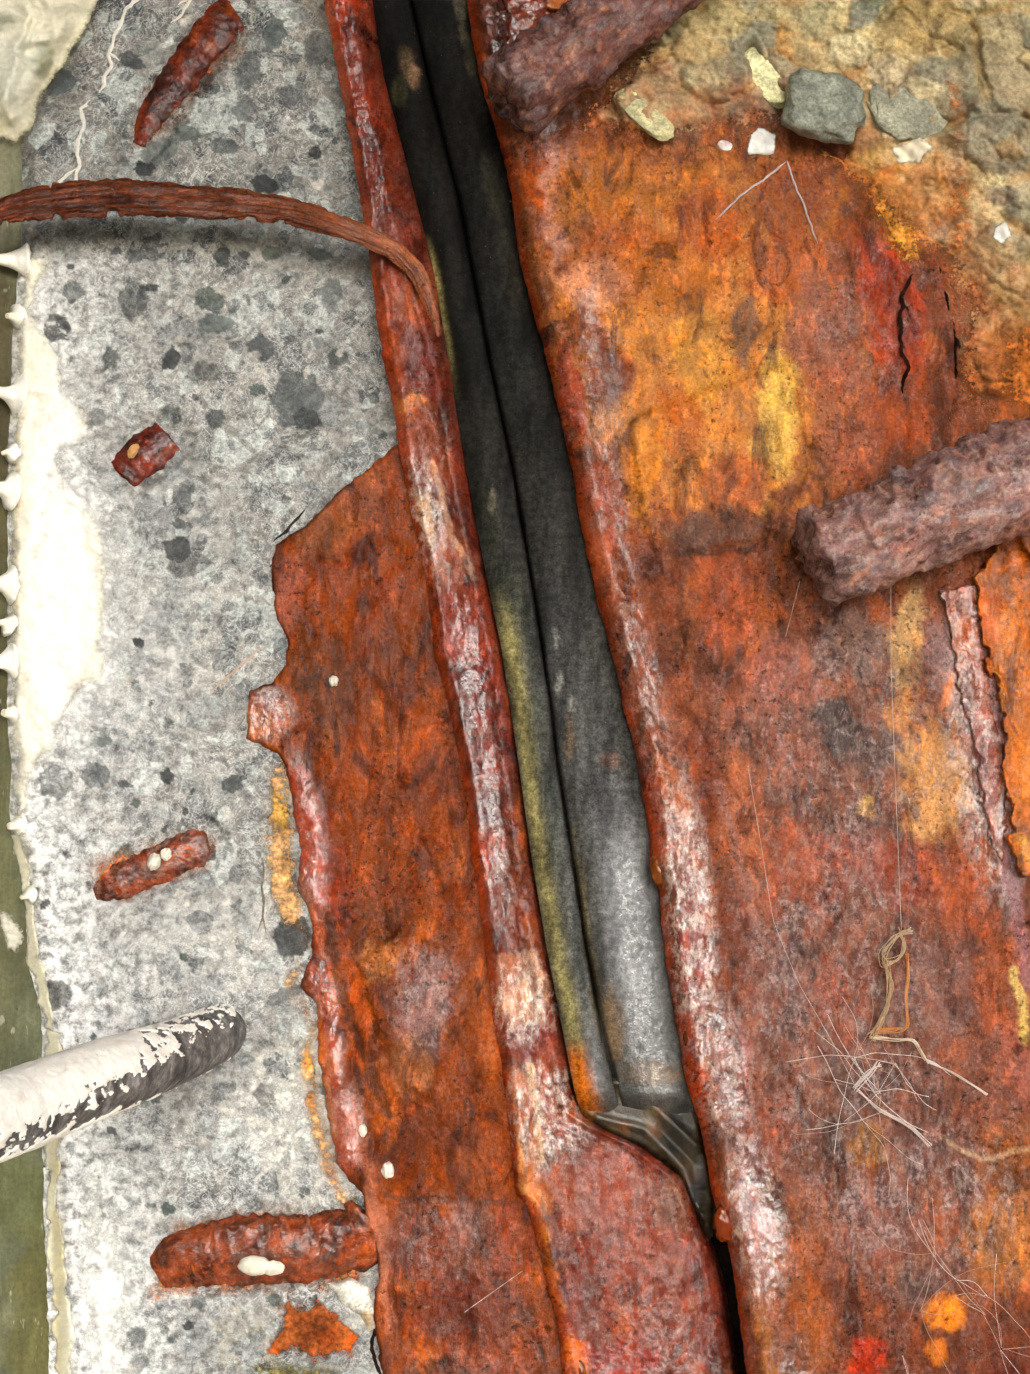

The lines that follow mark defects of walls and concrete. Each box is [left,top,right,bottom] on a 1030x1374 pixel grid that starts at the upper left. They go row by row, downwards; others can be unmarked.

rust [133,0,244,147]
rust [480,0,705,137]
rust [0,178,442,337]
rust [876,186,918,262]
crack [897,267,961,393]
rust [111,422,180,487]
leakage [0,242,136,1056]
rust [791,327,1030,878]
rust [93,829,213,901]
rust [267,763,302,929]
rust [150,1026,378,1298]
rust [254,1300,359,1374]